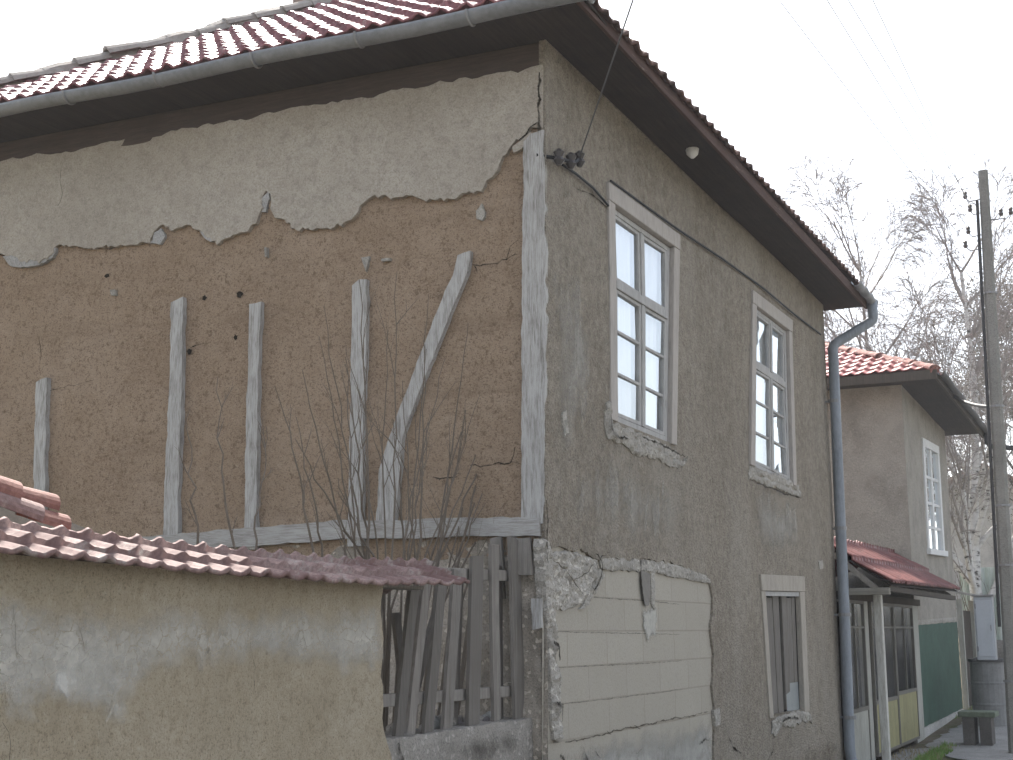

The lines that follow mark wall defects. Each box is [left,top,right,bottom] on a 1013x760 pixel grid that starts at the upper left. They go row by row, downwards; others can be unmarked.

crack [518,72,541,141]
flaking render [0,129,538,538]
flaking render [251,539,348,557]
flaking render [364,536,721,760]